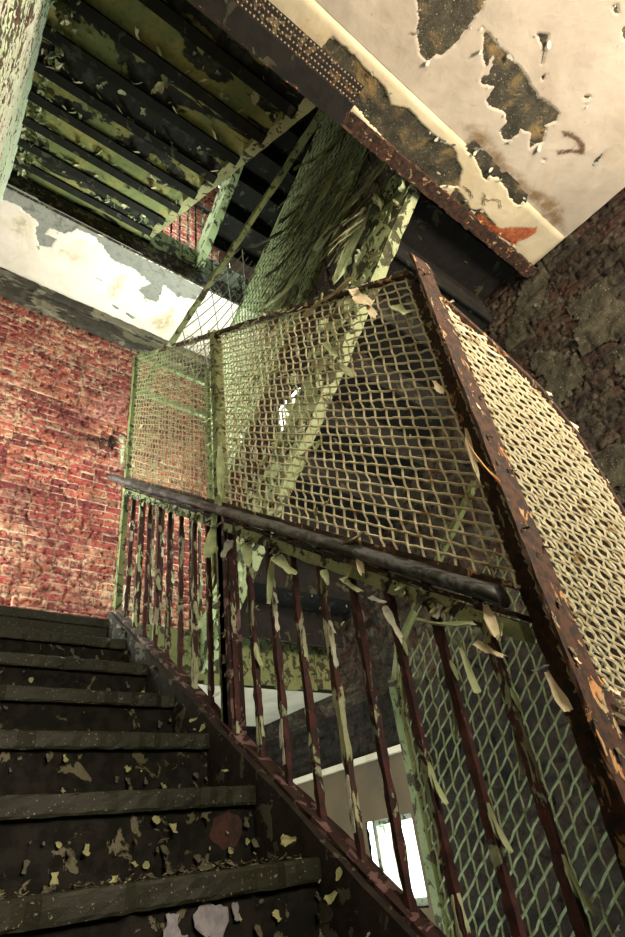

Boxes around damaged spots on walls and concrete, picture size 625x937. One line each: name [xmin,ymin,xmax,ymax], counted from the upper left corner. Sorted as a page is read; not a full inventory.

peeling [14,43,101,181]
spalling [322,37,528,250]
spalling [415,0,559,164]
spalling [3,183,203,302]
rust [477,214,537,246]
peeling [270,244,380,480]
peeling [198,574,226,677]
peeling [41,872,59,893]
peeling [56,841,90,857]
peeling [152,815,184,875]
peeling [281,834,297,847]
peeling [315,867,342,905]